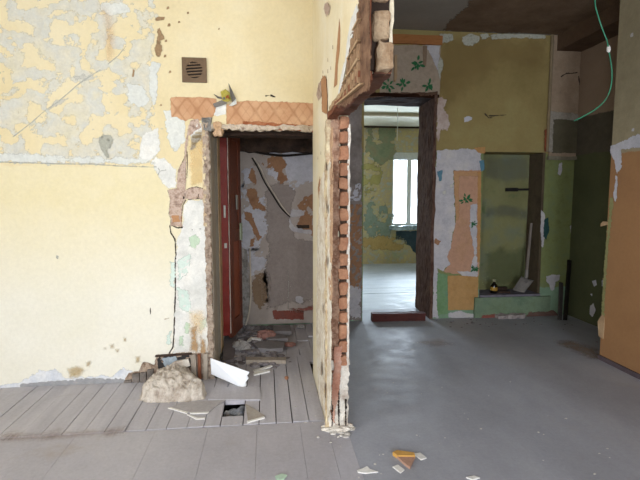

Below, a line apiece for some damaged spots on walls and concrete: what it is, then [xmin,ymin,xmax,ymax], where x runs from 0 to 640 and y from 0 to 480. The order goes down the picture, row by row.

crack [1,152,203,354]
peeling [0,0,342,423]
flaking render [316,0,417,321]
peeling [393,91,450,141]
peeling [433,147,485,319]
flaking render [462,33,546,46]
peeling [590,128,640,317]